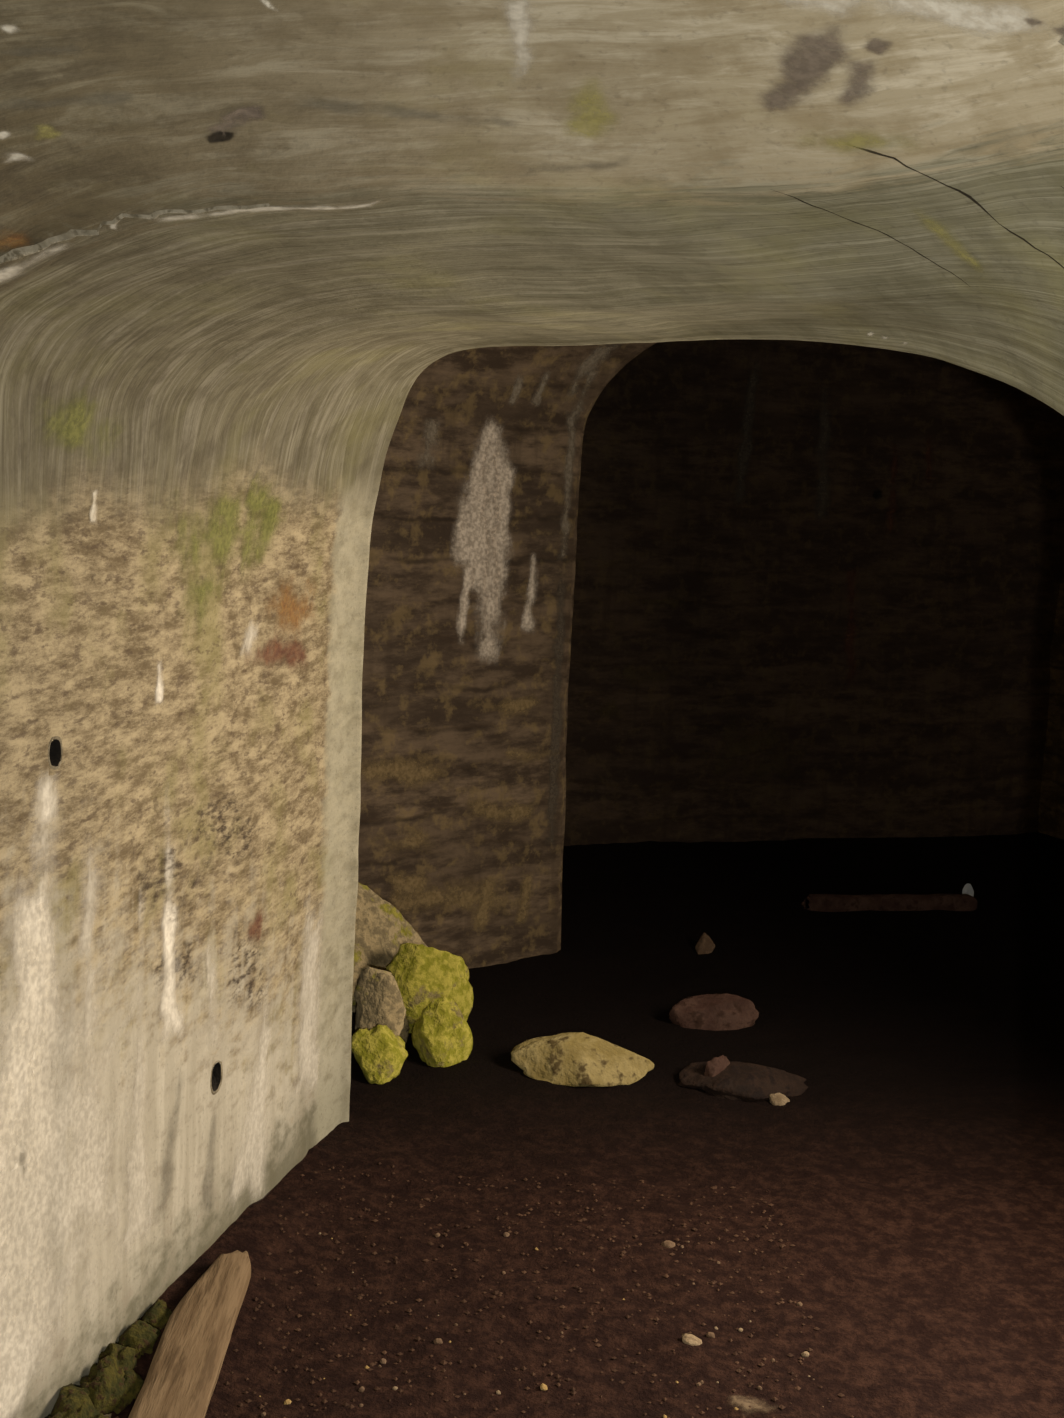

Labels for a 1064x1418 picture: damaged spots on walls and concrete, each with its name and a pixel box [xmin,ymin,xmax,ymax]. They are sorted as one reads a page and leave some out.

crack [779,192,968,285]
crack [853,146,1064,268]
damp [453,422,514,660]
damp [521,557,536,631]
damp [38,779,56,843]
damp [199,802,252,854]
damp [140,849,262,1031]
damp [296,922,319,1092]
damp [0,873,148,1418]
damp [233,1028,270,1197]